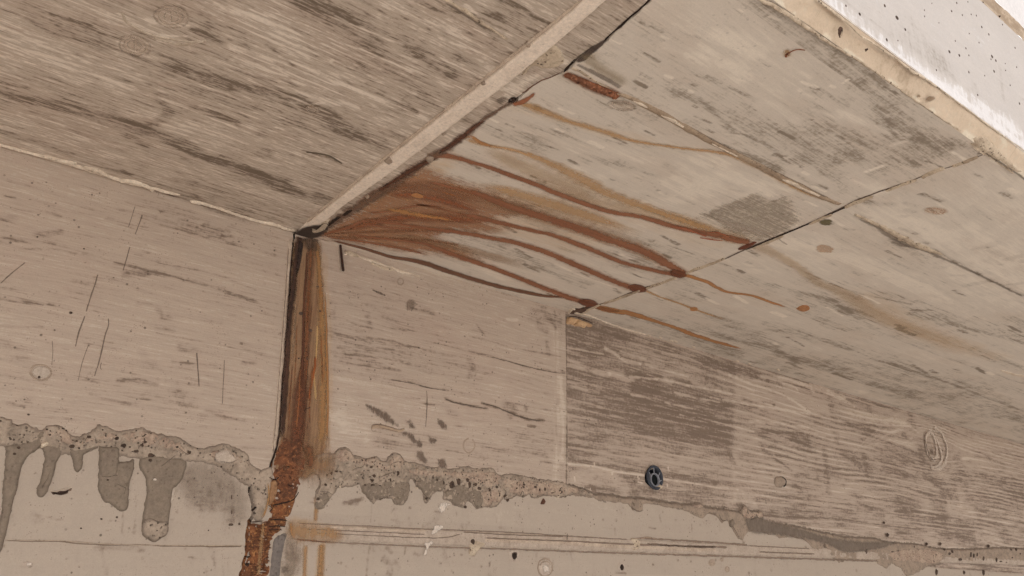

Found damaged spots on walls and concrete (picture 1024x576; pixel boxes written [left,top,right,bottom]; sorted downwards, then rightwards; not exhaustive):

crack [508,0,650,104]
rust [239,93,810,576]
damp [424,503,450,555]
damp [746,512,895,552]